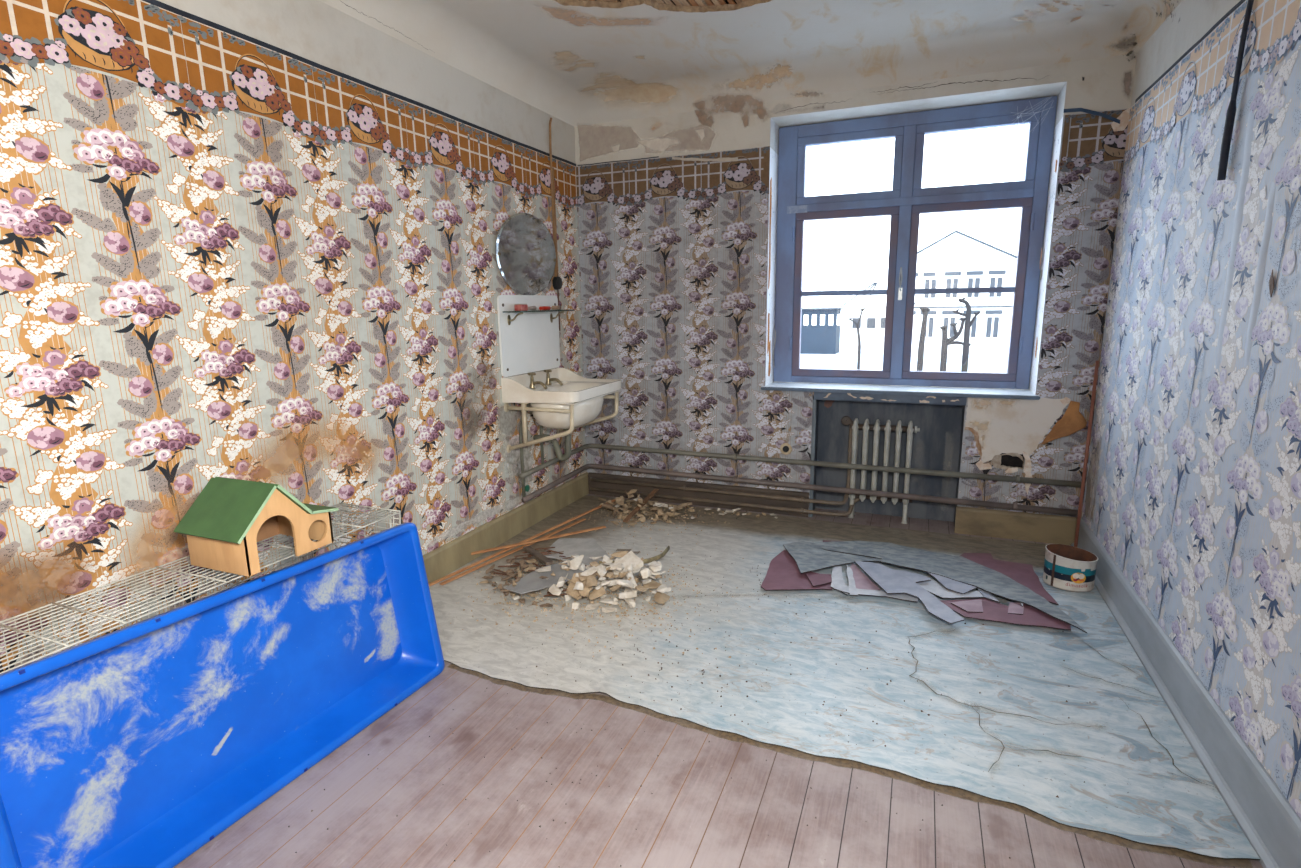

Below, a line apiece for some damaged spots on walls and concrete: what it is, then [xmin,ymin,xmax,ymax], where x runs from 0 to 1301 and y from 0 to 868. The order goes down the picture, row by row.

flaking render [578,125,738,162]
spalling [992,453,1024,474]
water stain [0,554,80,621]